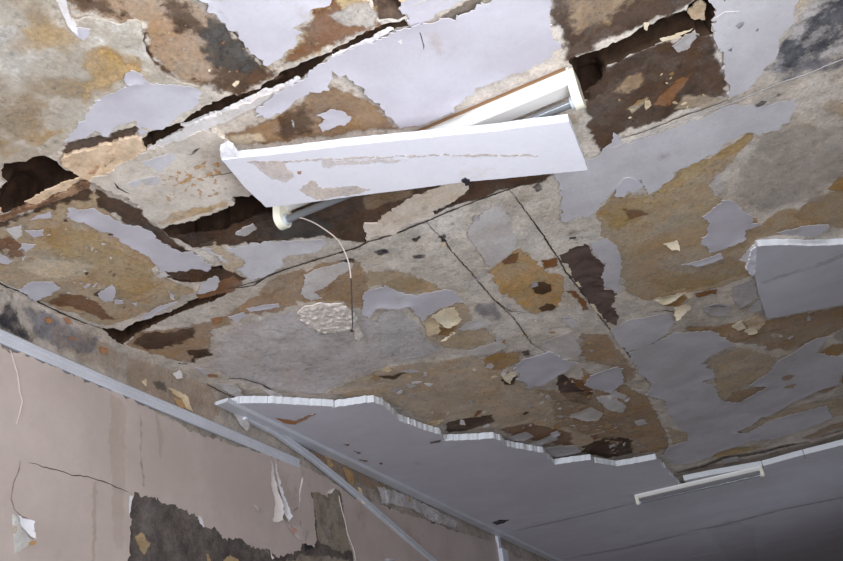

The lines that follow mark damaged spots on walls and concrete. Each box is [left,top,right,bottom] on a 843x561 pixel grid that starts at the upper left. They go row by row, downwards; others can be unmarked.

peeling [64,0,409,147]
crack [407,0,445,50]
spalling [569,0,715,100]
spalling [0,156,80,213]
peeling [0,195,330,345]
crack [227,175,610,353]
crack [206,374,283,397]
crack [379,369,420,380]
peeling [361,286,630,427]
peeling [560,238,843,465]
crack [28,462,133,495]
spalling [128,489,353,561]